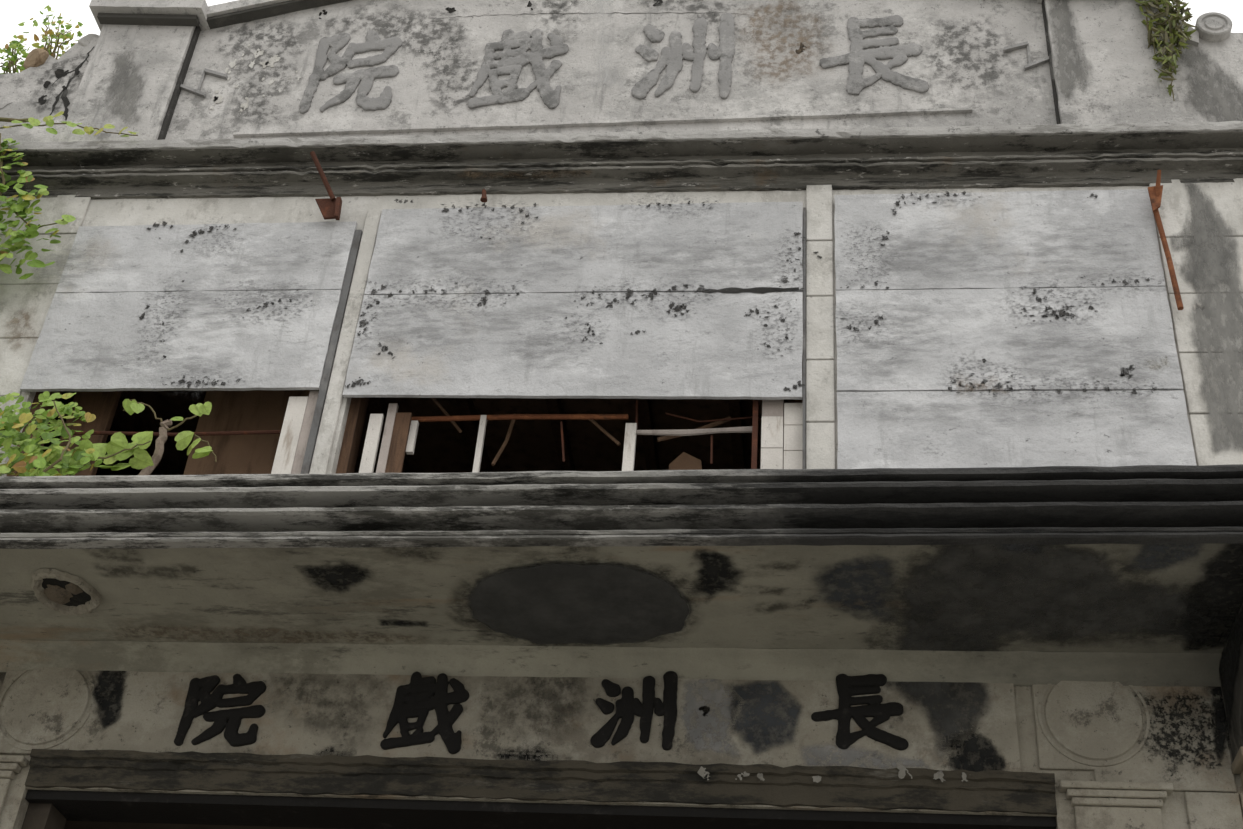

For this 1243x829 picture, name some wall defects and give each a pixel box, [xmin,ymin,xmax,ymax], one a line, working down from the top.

crack [49,47,94,120]
damp [109,54,144,120]
damp [1171,183,1243,452]
spalling [31,568,102,616]
damp [304,563,368,591]
damp [694,550,740,595]
damp [817,530,1243,776]
damp [93,671,126,728]
damp [731,682,800,752]